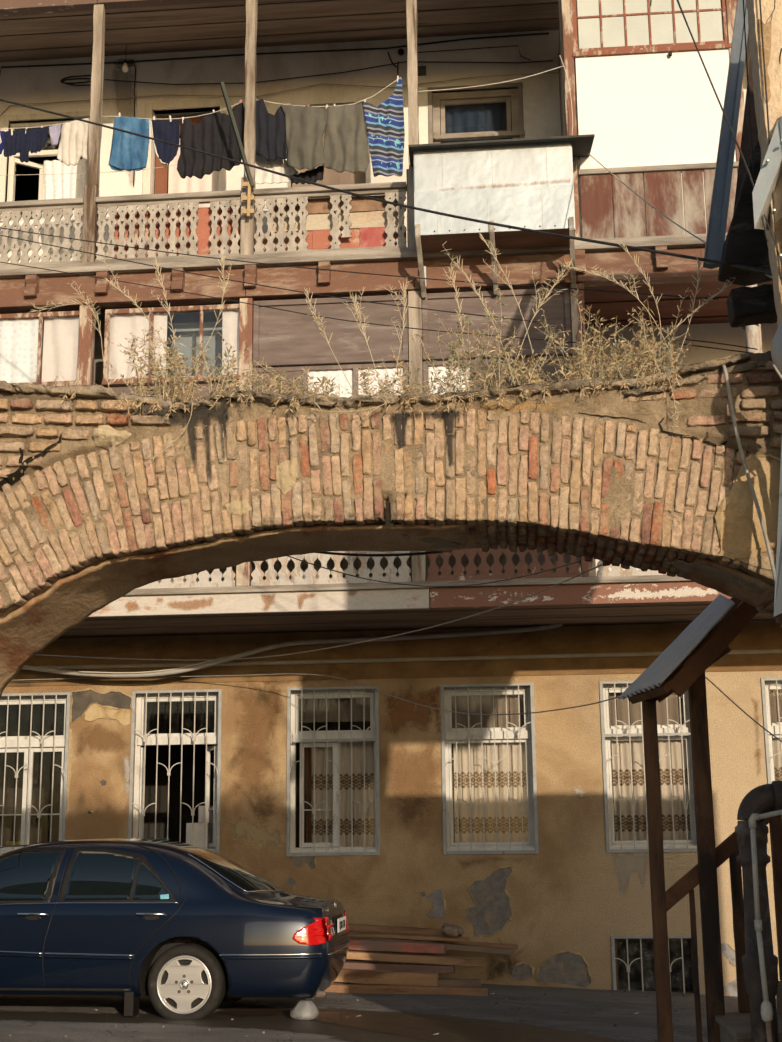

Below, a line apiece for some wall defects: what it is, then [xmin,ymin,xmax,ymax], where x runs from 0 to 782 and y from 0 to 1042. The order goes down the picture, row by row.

crack [0,435,61,490]
leakage [152,395,237,478]
leakage [392,394,567,466]
peeling [608,586,718,601]
peeling [66,688,132,821]
peeling [465,865,514,938]
peeling [511,949,592,988]